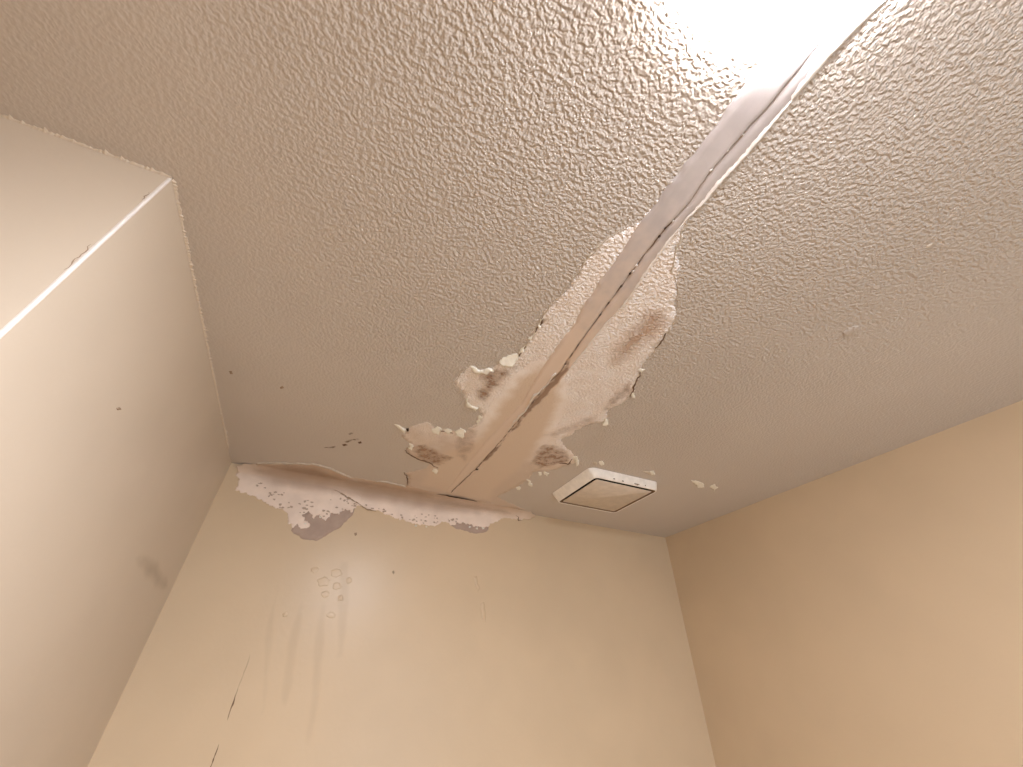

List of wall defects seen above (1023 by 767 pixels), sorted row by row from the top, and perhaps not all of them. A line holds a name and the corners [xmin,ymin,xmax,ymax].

peeling [235,197,693,541]
crack [452,57,810,492]